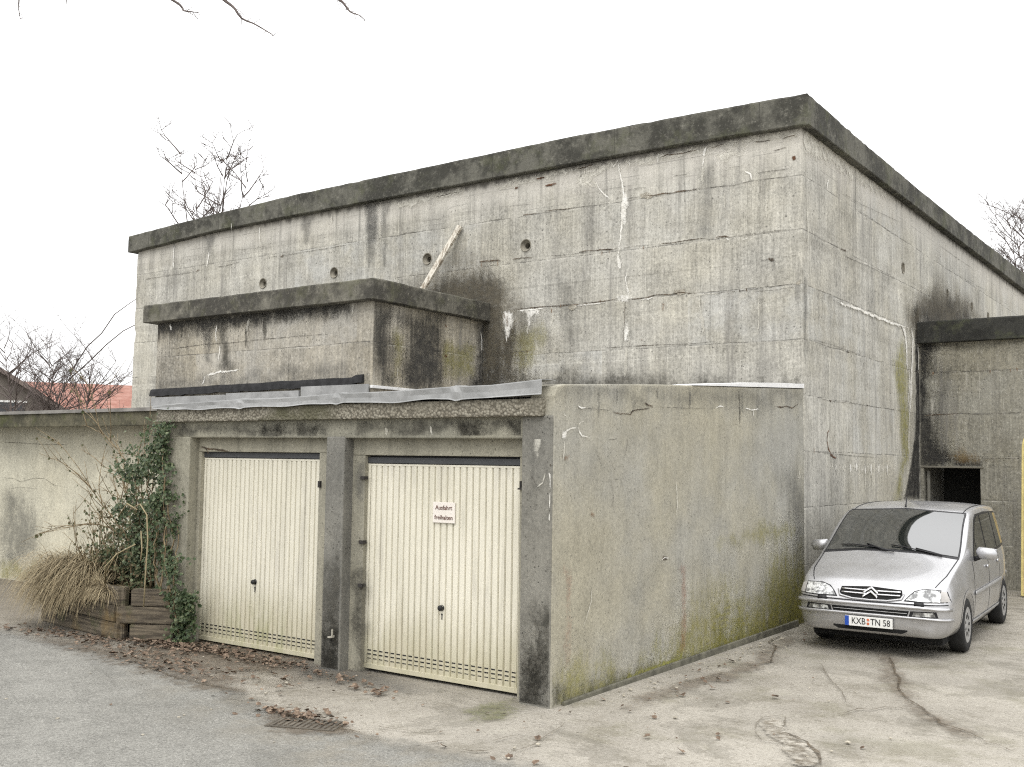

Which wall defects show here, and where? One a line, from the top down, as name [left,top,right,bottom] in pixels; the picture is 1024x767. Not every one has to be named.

damp [202,324,237,384]
damp [472,327,483,386]
damp [502,309,554,383]
damp [547,372,632,385]
damp [835,303,980,498]
crack [532,400,677,501]
damp [519,613,594,705]
crack [889,657,1023,756]